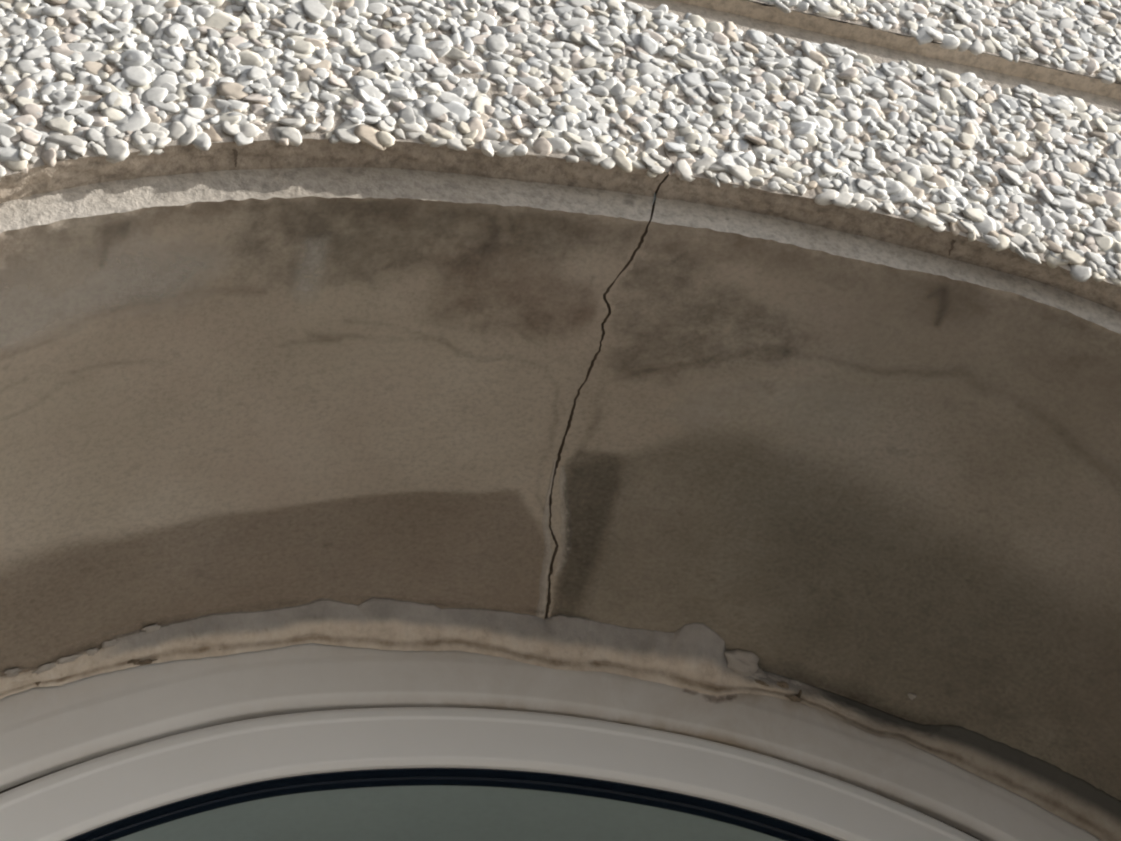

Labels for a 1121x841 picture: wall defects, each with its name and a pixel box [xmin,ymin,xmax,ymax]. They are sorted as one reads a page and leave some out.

crack [536,149,674,619]